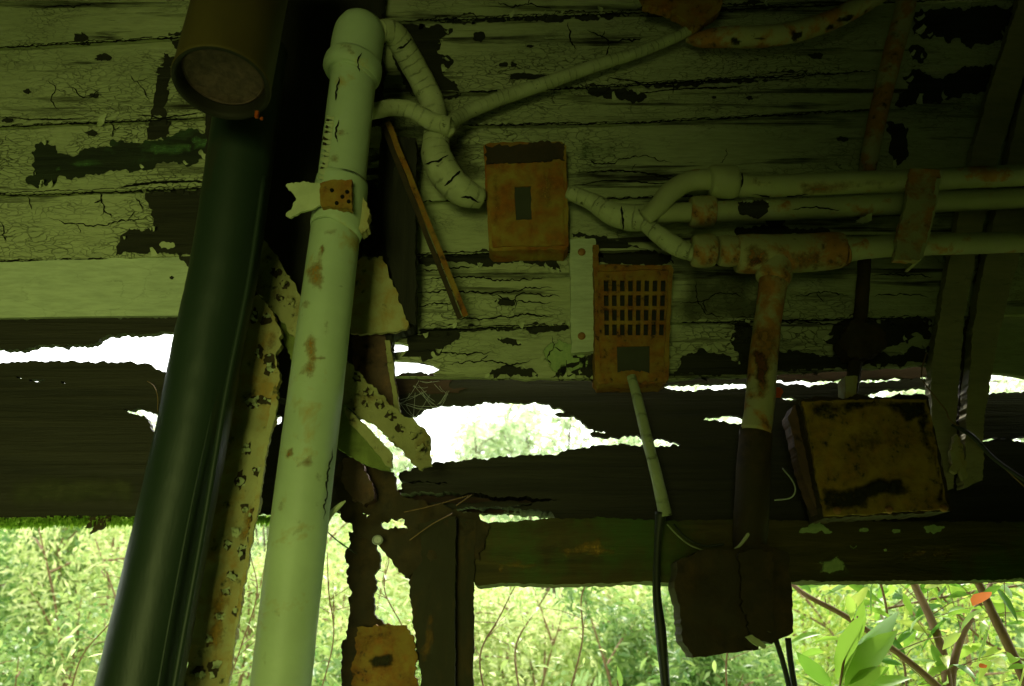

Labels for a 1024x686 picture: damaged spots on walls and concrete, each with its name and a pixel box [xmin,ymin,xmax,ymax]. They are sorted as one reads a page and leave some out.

peeling [402,6,650,100]
peeling [895,4,1013,110]
crack [0,77,205,137]
peeling [25,26,207,188]
crack [0,180,202,231]
crack [0,224,103,262]
crack [417,251,563,366]
peeling [395,320,570,365]
peeling [674,318,753,381]
peeling [862,315,932,369]
mould [814,400,930,448]
leakage [823,479,907,510]